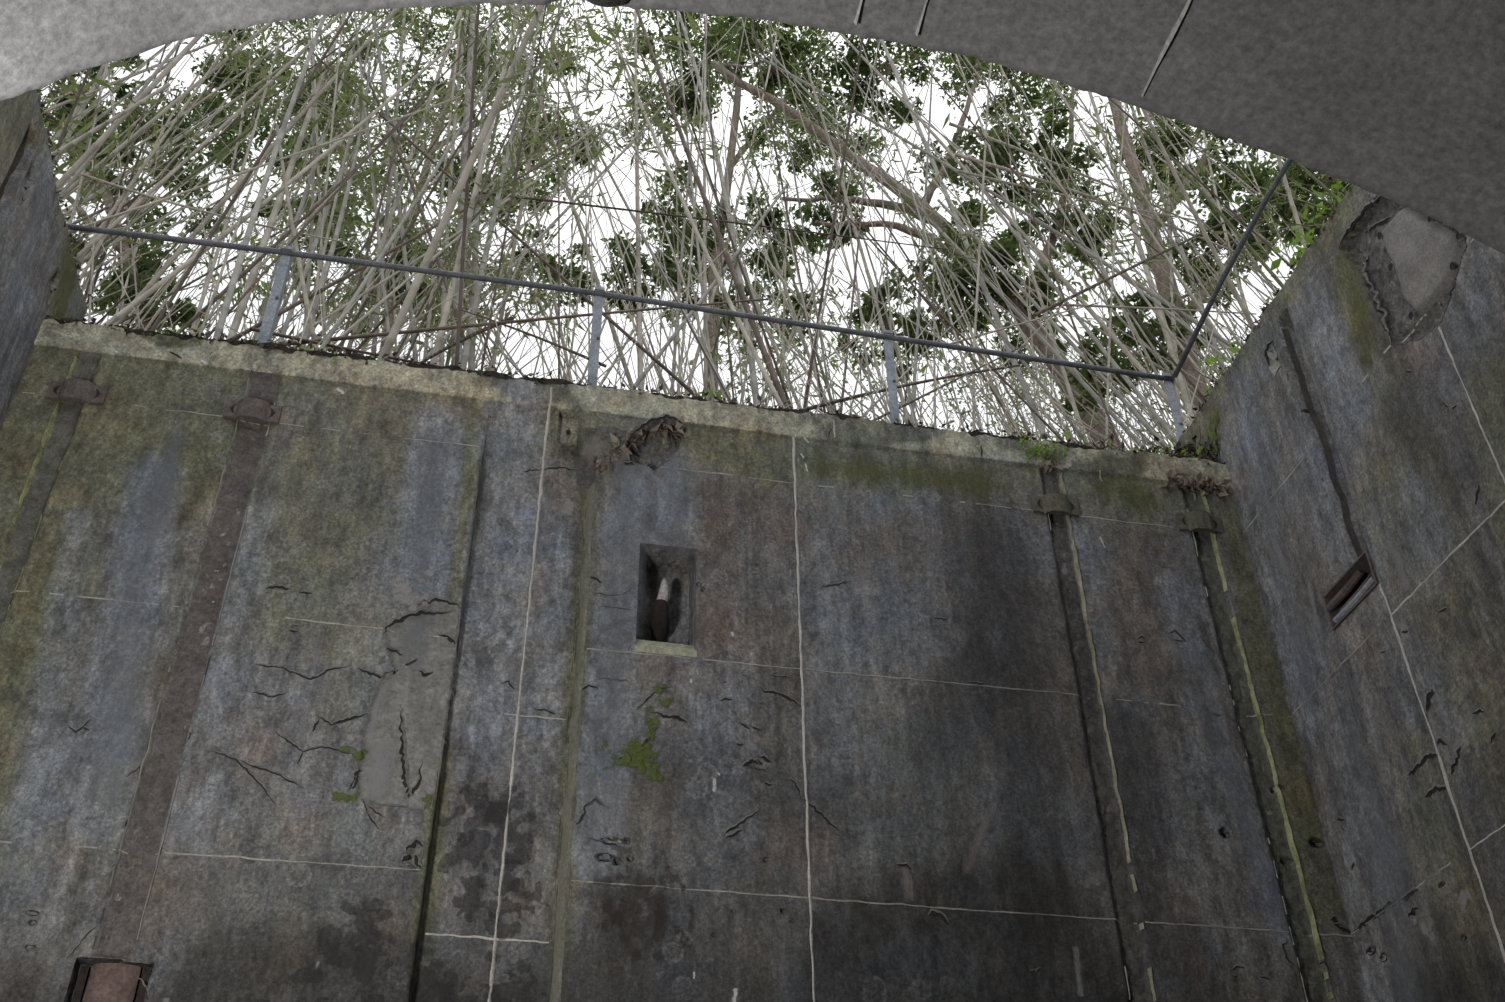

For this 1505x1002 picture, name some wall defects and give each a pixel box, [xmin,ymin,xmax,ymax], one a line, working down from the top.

spalling [1338,195,1468,348]
spalling [583,413,688,471]
crack [210,585,401,829]
crack [501,676,688,760]
crack [720,672,801,746]
crack [575,796,622,847]
crack [722,809,759,838]
crack [788,778,841,832]